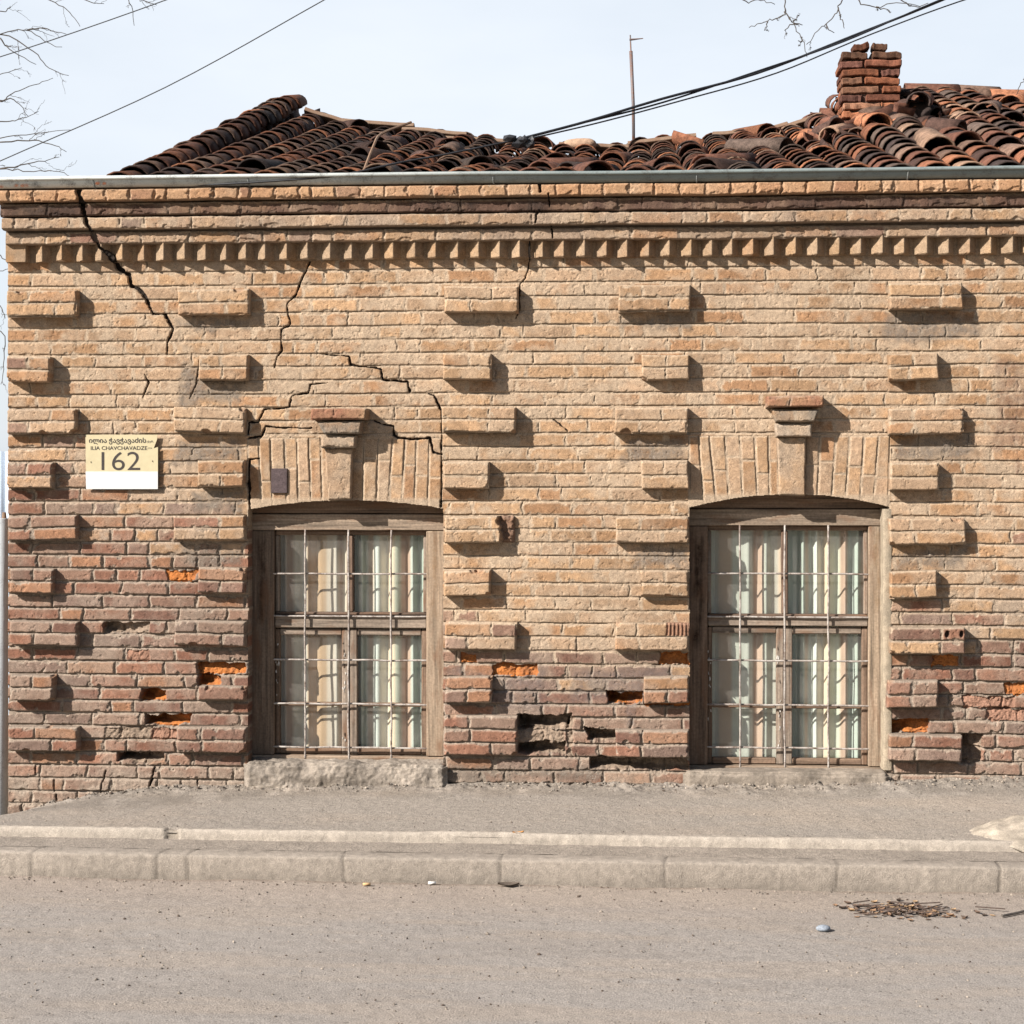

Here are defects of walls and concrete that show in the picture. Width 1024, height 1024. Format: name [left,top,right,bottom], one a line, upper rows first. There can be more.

crack [77,189,174,354]
crack [516,184,553,318]
crack [275,262,311,367]
crack [248,383,326,509]
crack [323,354,443,506]
spalling [104,688,192,764]
spalling [197,661,246,686]
spalling [518,713,575,758]
spalling [607,690,690,707]
spalling [658,651,690,665]
hole [891,718,929,733]
spalling [962,682,1024,722]